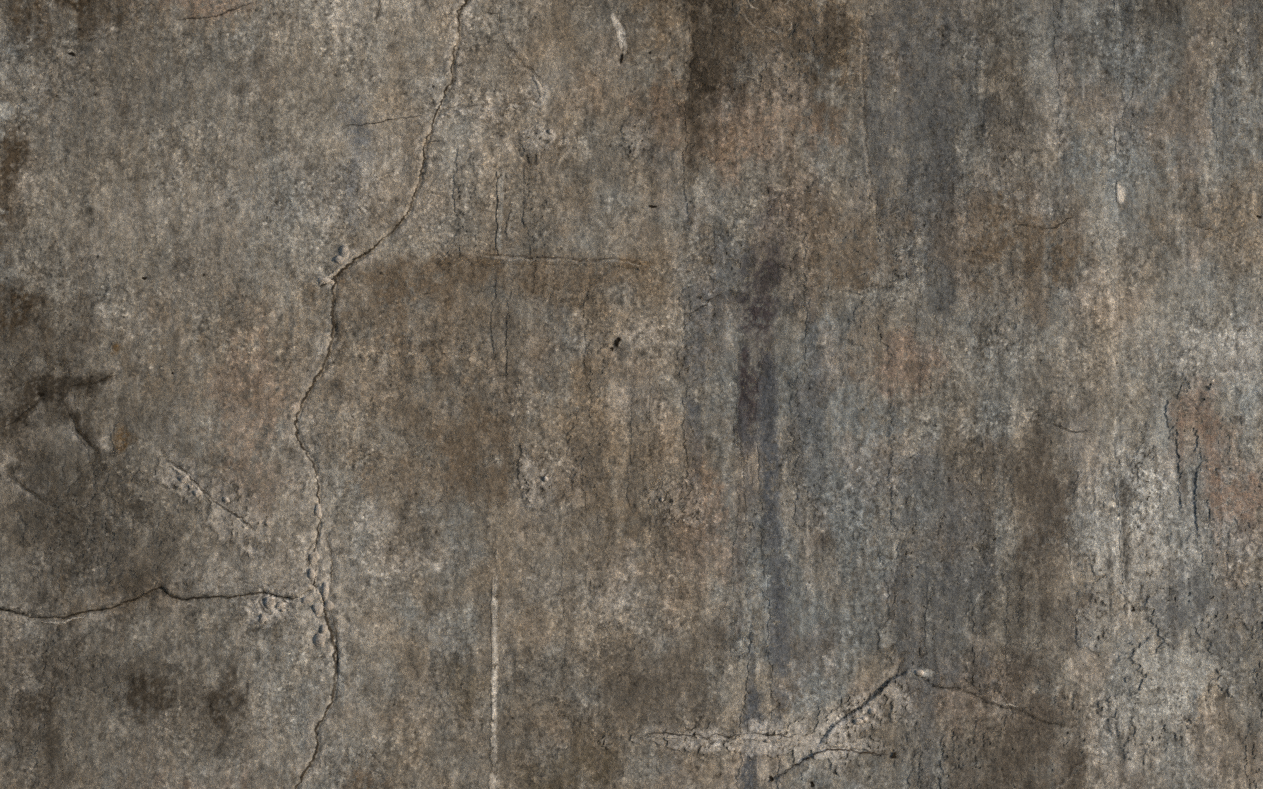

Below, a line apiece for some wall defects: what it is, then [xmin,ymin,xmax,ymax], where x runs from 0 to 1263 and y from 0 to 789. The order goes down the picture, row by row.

crack [0,0,543,789]
water stain [303,0,1105,789]